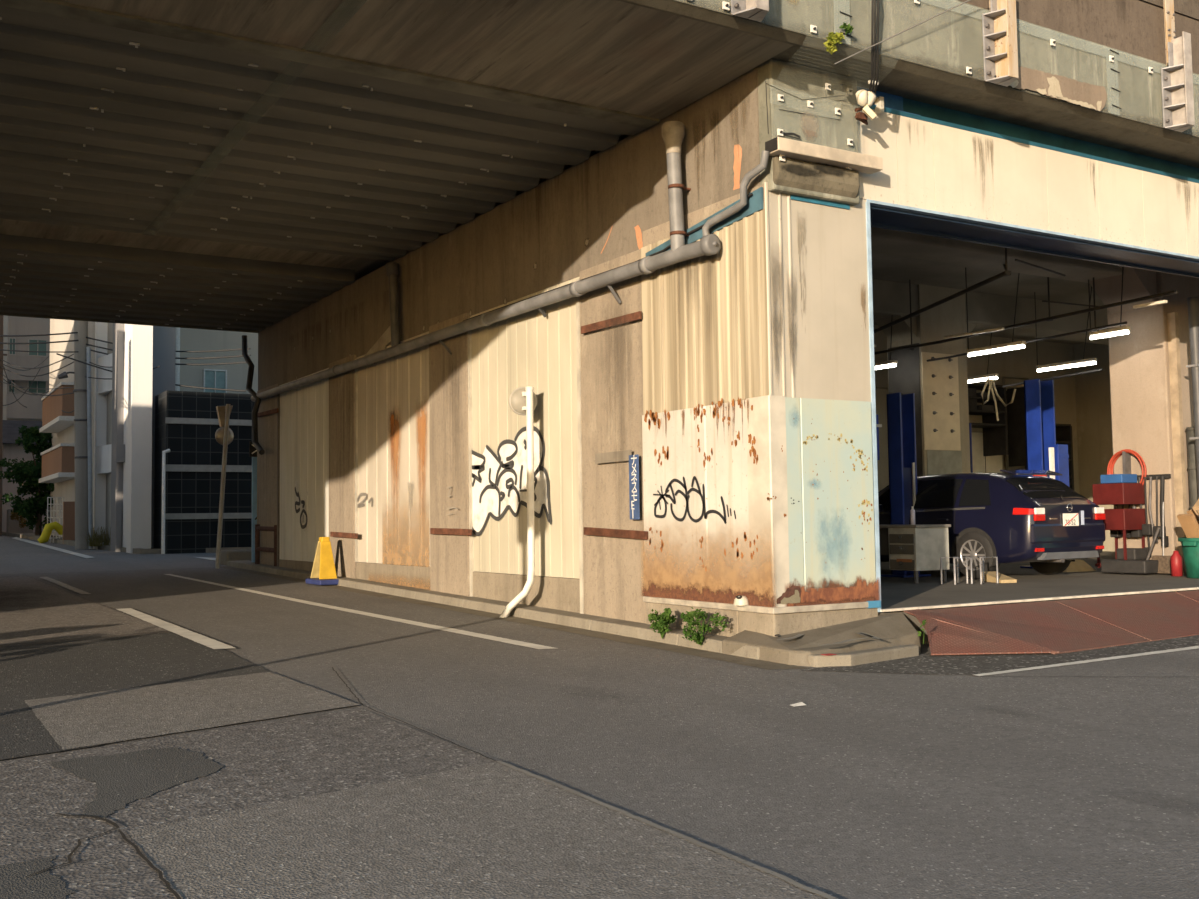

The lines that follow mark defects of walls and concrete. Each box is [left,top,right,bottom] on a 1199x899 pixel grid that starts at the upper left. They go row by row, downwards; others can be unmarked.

corrosion [644,397,758,467]